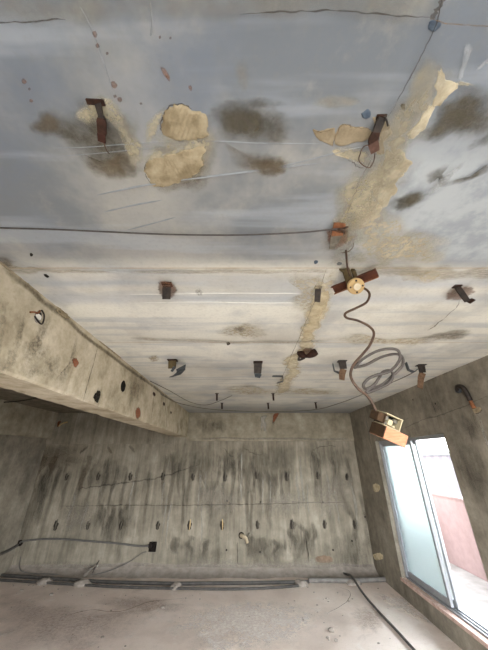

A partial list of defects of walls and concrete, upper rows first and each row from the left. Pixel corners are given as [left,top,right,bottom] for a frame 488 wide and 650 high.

crack [240,0,488,119]
damp [60,118,129,176]
peeling [81,104,140,155]
spalling [144,103,209,187]
damp [224,112,282,141]
peeling [313,109,376,168]
peeling [339,68,469,242]
damp [433,97,488,136]